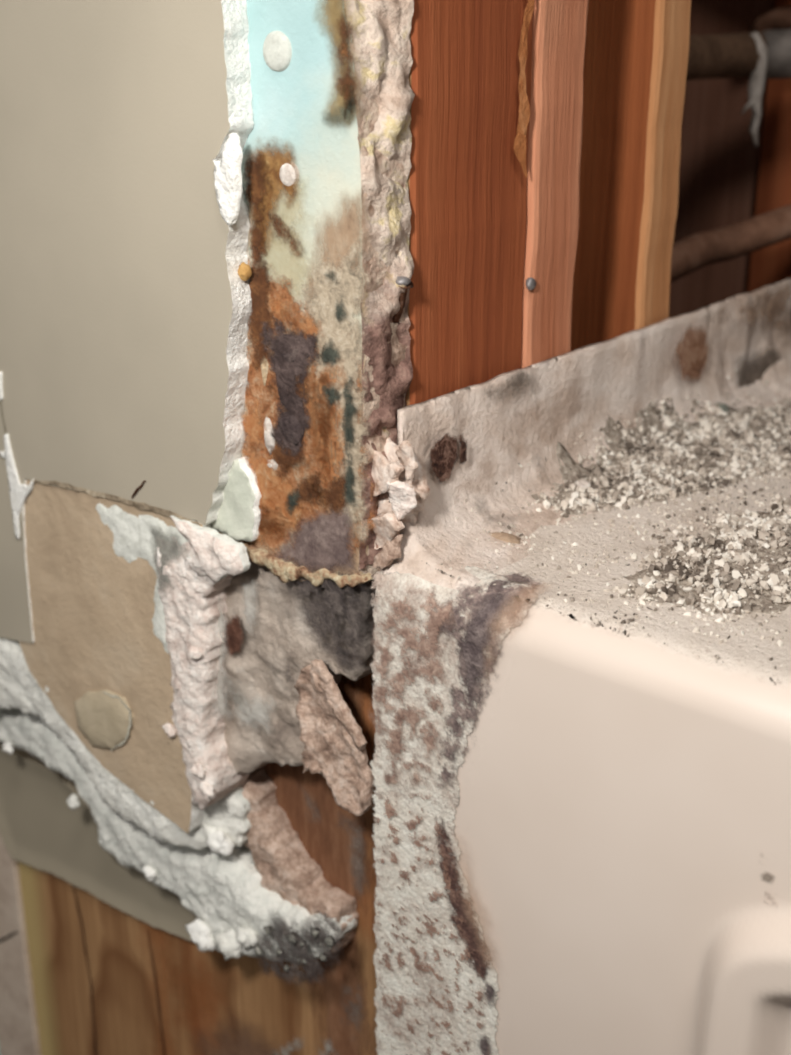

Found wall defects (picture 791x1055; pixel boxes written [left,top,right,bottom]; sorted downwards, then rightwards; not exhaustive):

water stain [302,199,369,538]
mould [287,492,299,513]
flaking render [96,503,250,653]
water stain [339,680,361,724]
peeling [2,742,14,754]
peeling [67,794,80,810]
peeling [191,763,216,802]
peeling [202,824,236,856]
water stain [262,763,375,899]
peeling [143,866,157,882]
peeling [186,918,258,960]
water stain [255,910,368,1055]